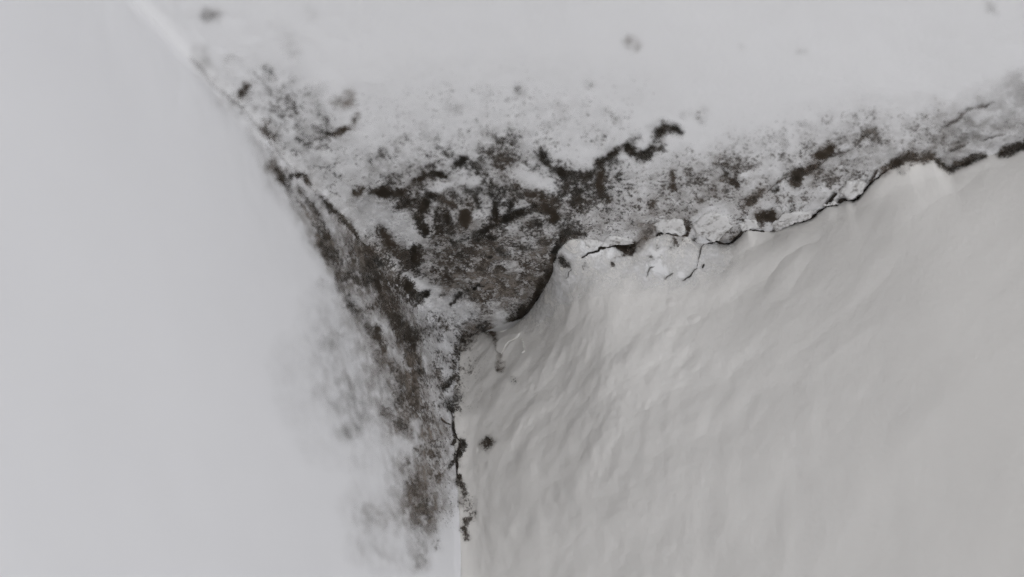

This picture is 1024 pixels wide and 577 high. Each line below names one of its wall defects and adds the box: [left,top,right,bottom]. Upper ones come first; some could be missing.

crack [560,231,617,278]
peeling [583,235,635,248]
flaking render [651,211,758,242]
flaking render [772,178,867,231]
damp [229,66,1024,565]